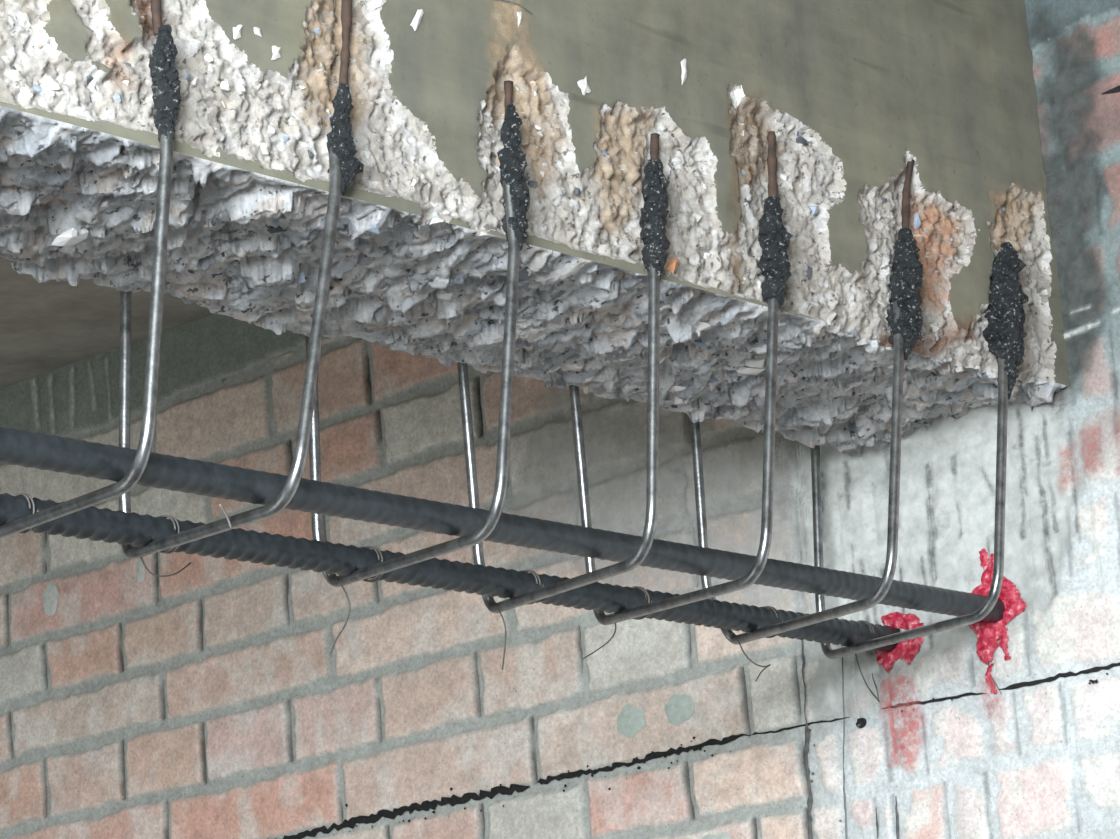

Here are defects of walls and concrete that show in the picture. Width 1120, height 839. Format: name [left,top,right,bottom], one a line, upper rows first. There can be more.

corrosion [486,0,554,188]
corrosion [597,113,652,227]
corrosion [909,207,956,306]
damp [1033,15,1119,398]
spalling [0,0,1070,702]
corrosion [913,325,972,356]
crack [267,640,850,839]
crack [872,662,1120,712]
crack [876,796,899,839]